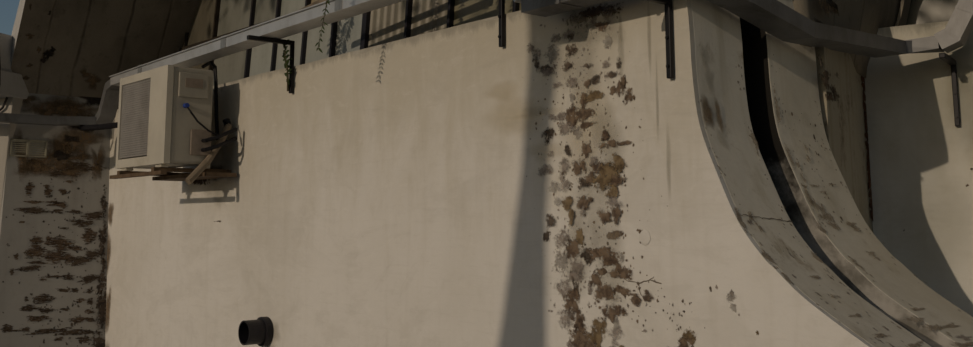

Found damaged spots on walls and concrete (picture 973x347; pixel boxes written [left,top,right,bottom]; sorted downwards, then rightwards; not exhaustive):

peeling [2,160,109,346]
peeling [526,6,705,347]
peeling [709,285,740,316]
spalling [734,194,796,284]
spalling [786,55,871,234]
peeling [873,308,973,347]